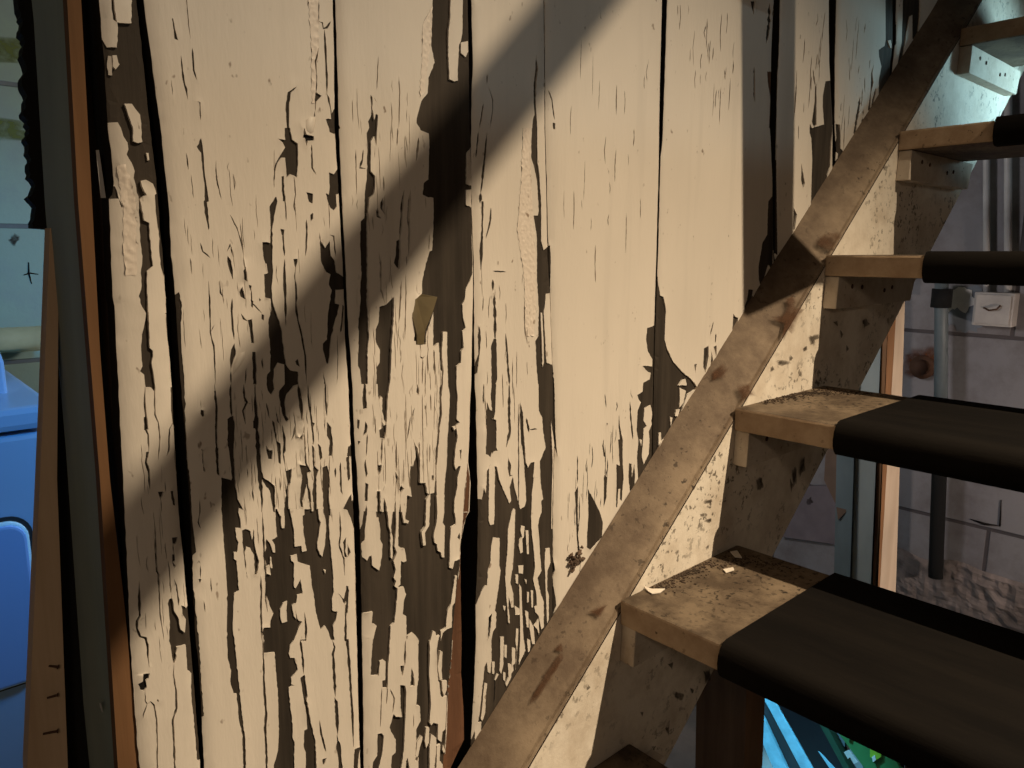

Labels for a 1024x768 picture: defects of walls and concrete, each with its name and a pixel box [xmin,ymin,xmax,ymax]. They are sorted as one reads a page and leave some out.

peeling [102,0,164,390]
peeling [221,0,557,768]
peeling [604,277,715,507]
peeling [775,304,803,336]